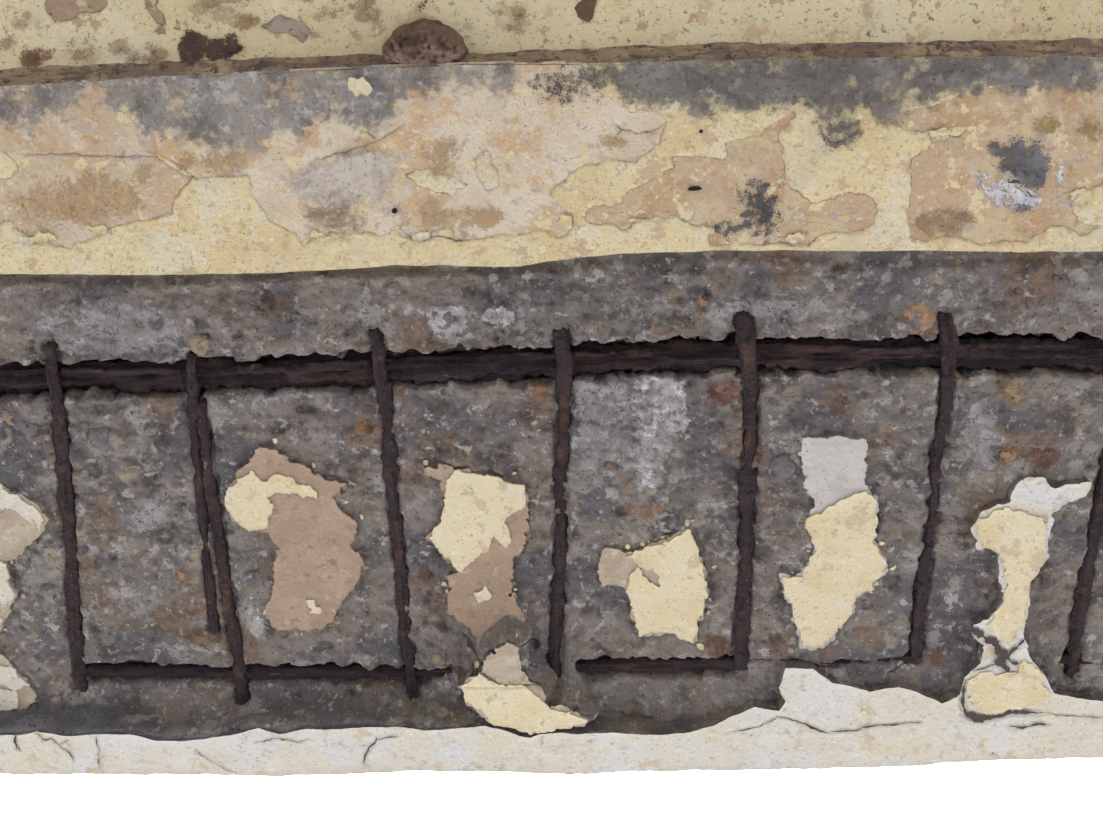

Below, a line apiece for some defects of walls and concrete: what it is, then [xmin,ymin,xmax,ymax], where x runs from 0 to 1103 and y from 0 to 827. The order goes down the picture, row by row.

peeling [0,0,108,51]
peeling [108,0,167,66]
peeling [189,0,243,24]
peeling [261,0,382,43]
peeling [491,6,527,35]
peeling [575,0,597,23]
peeling [62,37,93,61]
leakage [0,29,1103,153]
spalling [0,79,1103,737]
rust [707,381,740,407]
rust [705,636,732,659]